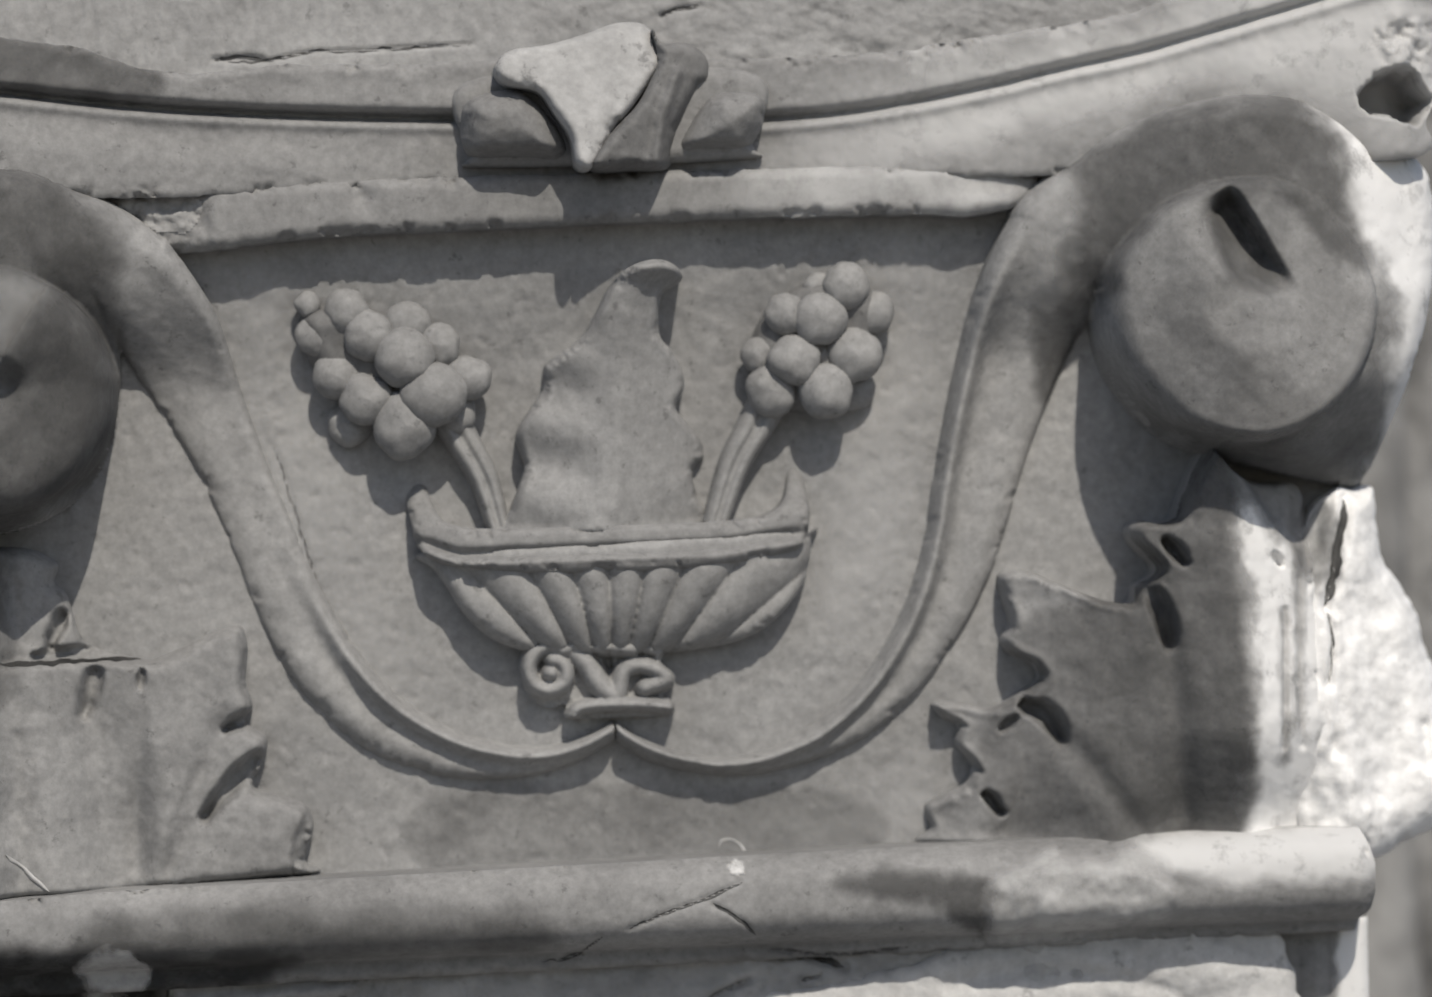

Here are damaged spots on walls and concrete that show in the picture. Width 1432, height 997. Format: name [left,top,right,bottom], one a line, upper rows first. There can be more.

spalling [1360,70,1424,124]
crack [1324,499,1348,682]
leakage [991,505,1375,982]
crack [544,882,908,982]
crack [709,980,747,997]